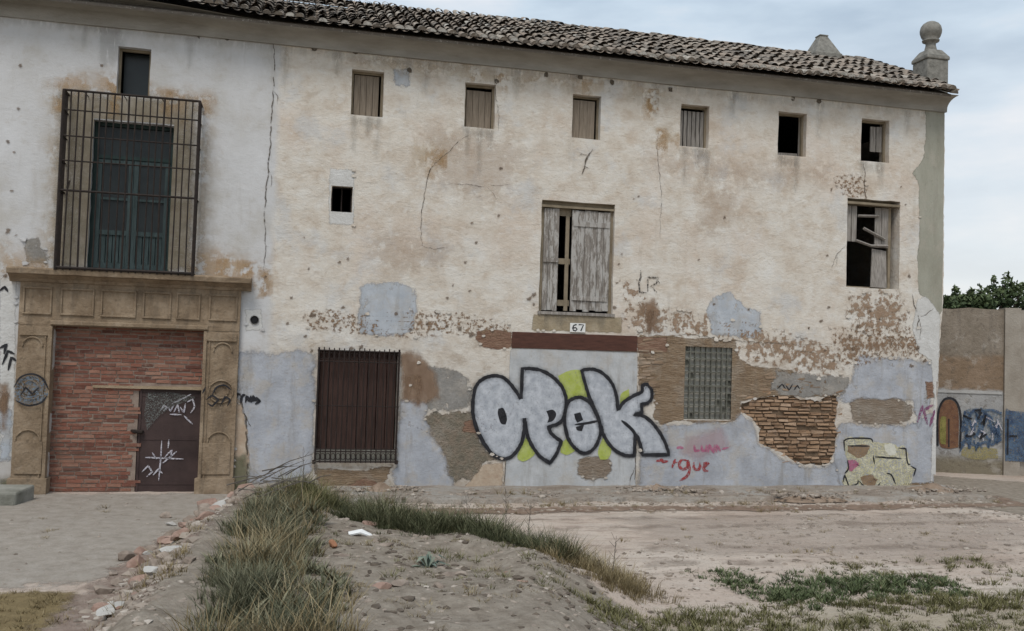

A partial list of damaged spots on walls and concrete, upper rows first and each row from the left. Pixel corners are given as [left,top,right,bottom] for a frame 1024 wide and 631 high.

crack [264,45,278,259]
peeling [6,229,50,265]
peeling [304,284,512,350]
spalling [527,281,931,466]
spalling [423,408,503,482]